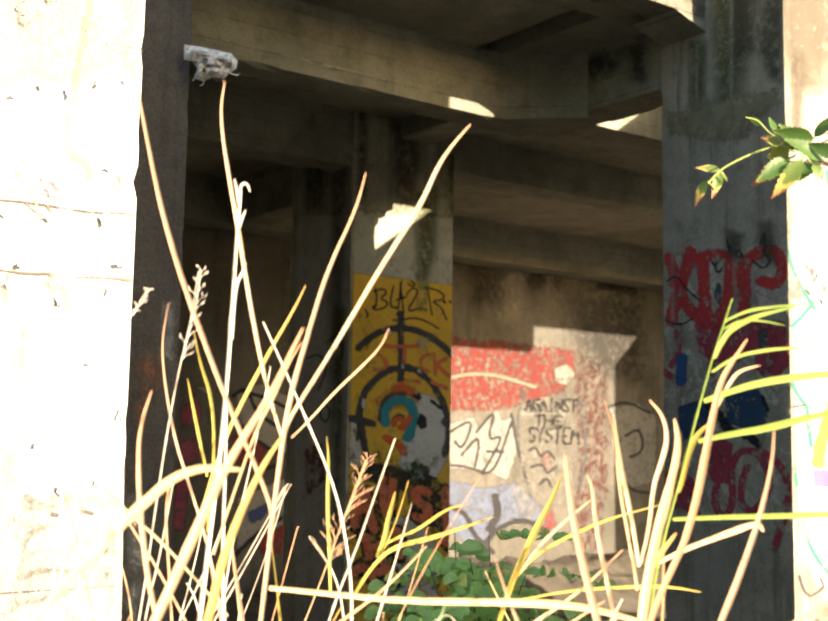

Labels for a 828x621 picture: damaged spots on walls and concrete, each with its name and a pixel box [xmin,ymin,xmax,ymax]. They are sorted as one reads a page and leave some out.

water stain [713,0,828,128]